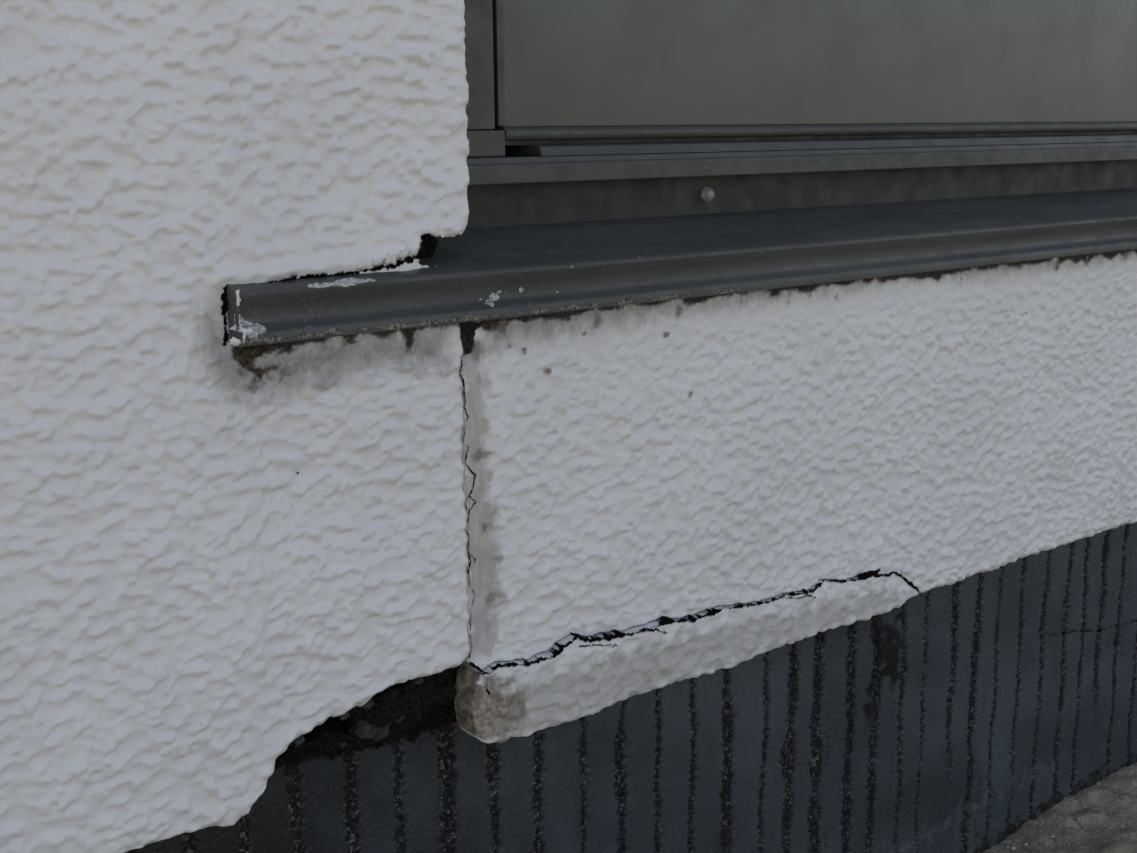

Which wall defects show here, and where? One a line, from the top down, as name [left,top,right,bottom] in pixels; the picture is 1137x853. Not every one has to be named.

crack [458,321,923,695]
flaking render [274,664,471,770]